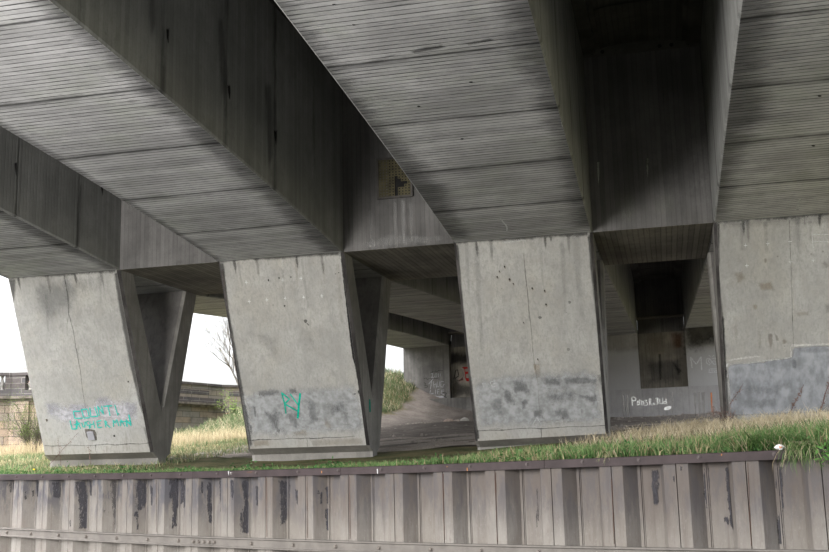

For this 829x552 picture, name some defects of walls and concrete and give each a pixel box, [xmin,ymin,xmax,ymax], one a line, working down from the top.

crack [64,276,87,414]